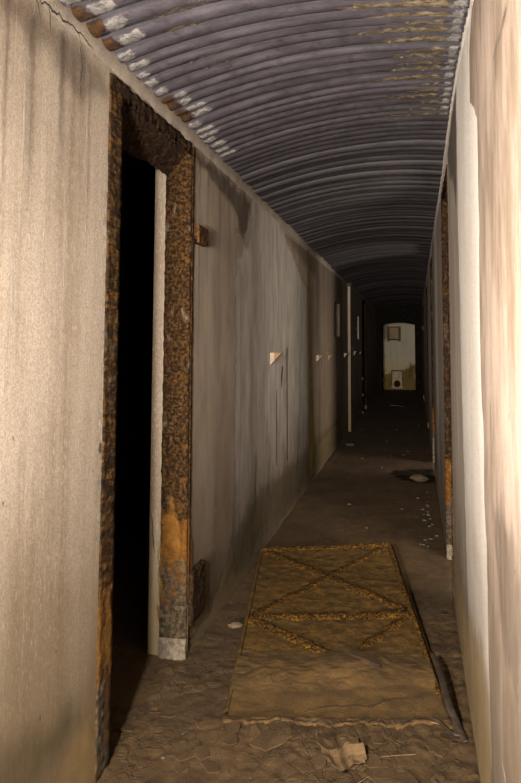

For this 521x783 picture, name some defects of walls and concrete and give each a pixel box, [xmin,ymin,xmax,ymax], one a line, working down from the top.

crack [36,0,95,95]
rust [71,6,124,52]
rust [160,95,195,123]
rust [162,497,193,571]